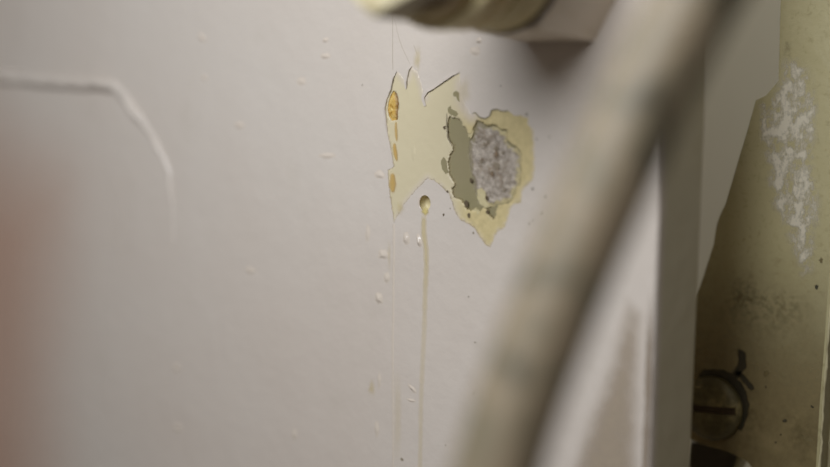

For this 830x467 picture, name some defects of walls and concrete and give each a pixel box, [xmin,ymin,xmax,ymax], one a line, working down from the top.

rust [388,91,399,160]
peeling [383,65,535,247]